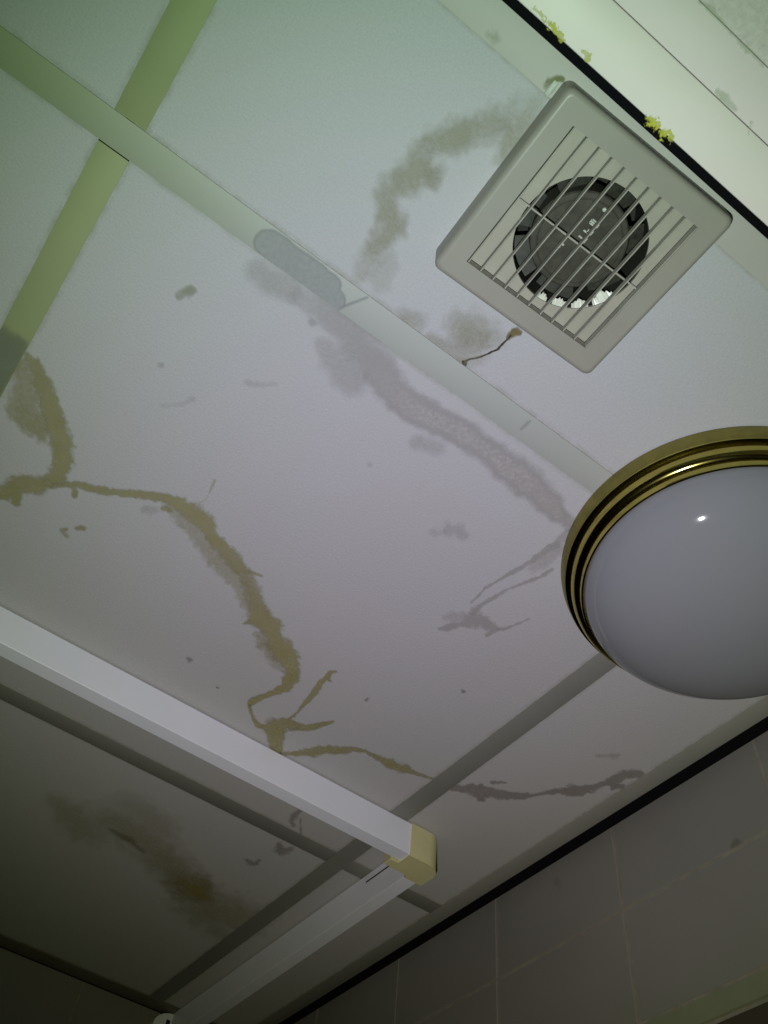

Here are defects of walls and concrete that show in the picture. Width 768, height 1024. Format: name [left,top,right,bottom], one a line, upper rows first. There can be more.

damp [254,230,363,310]
damp [340,324,574,527]
damp [0,354,428,778]
damp [439,540,561,636]
damp [450,771,643,801]